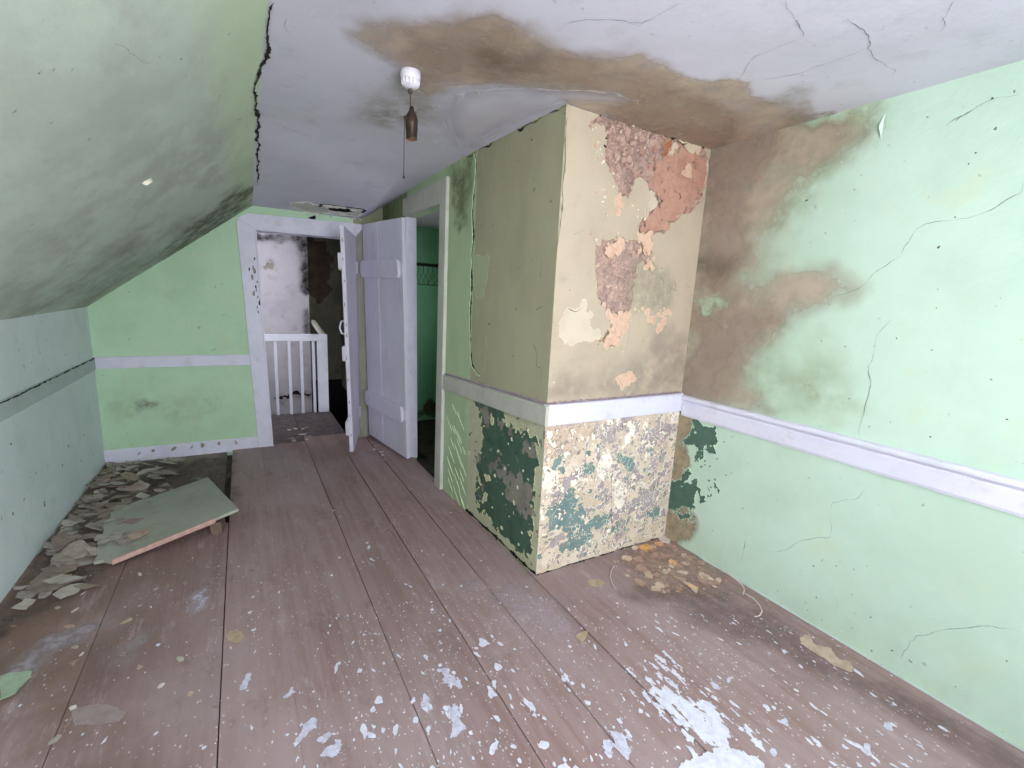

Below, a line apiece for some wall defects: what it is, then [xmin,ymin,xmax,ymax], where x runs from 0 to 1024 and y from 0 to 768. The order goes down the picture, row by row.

crack [253,3,289,181]
crack [740,1,896,80]
leakage [257,234,316,295]
leakage [357,16,866,407]
flaking render [558,114,710,352]
crack [834,186,1023,297]
peeling [467,401,727,575]
crack [901,626,1024,657]